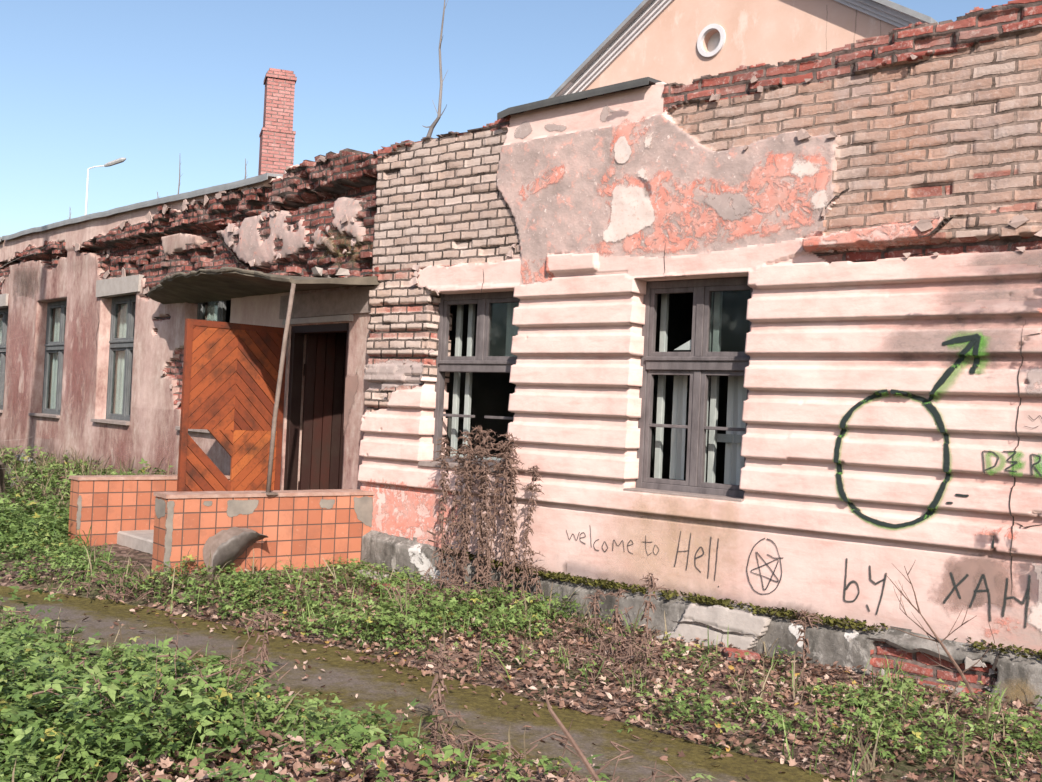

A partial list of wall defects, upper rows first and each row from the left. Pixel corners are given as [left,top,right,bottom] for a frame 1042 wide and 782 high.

spalling [72,26,1042,432]
crack [1009,320,1042,605]
peeling [354,480,459,585]
water stain [937,555,1014,609]
spalling [870,641,997,694]